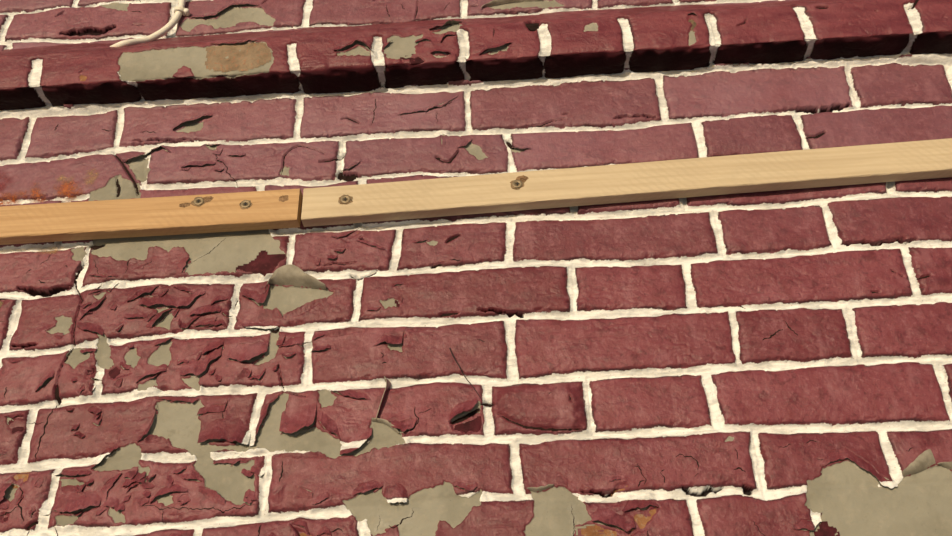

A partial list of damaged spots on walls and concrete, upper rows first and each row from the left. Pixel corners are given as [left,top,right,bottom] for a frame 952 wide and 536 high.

peeling [119,39,274,81]
peeling [181,2,275,32]
peeling [333,20,462,65]
peeling [471,0,561,10]
peeling [687,11,698,46]
crack [115,155,139,197]
crack [28,245,104,462]
peeling [0,227,432,536]
spalling [450,397,494,433]
peeling [344,481,482,536]
peeling [525,476,659,536]
peeling [792,448,952,536]